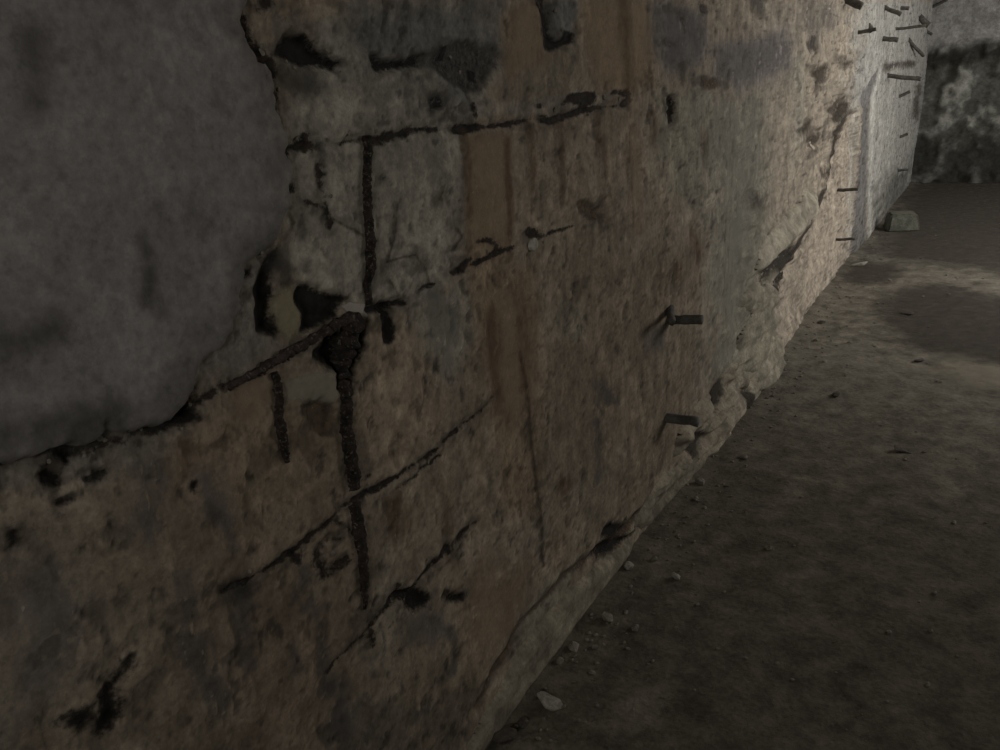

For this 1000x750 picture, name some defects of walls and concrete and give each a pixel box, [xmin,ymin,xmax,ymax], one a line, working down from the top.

spalling [430,41,496,93]
spalling [758,247,794,287]
spalling [226,135,405,610]
crack [220,396,493,594]
crack [325,521,477,674]